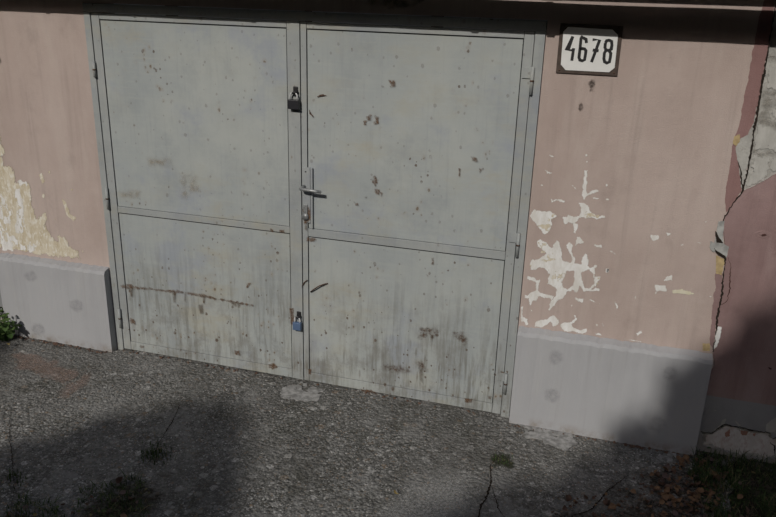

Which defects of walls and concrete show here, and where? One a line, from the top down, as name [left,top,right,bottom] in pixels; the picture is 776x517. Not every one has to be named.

crack [723,6,776,221]
flaking render [733,11,776,190]
peeling [0,136,84,260]
rust [122,285,248,312]
peeling [521,154,609,335]
peeling [655,275,694,295]
crack [713,258,731,352]
flaking render [701,425,776,458]
crack [478,461,503,517]